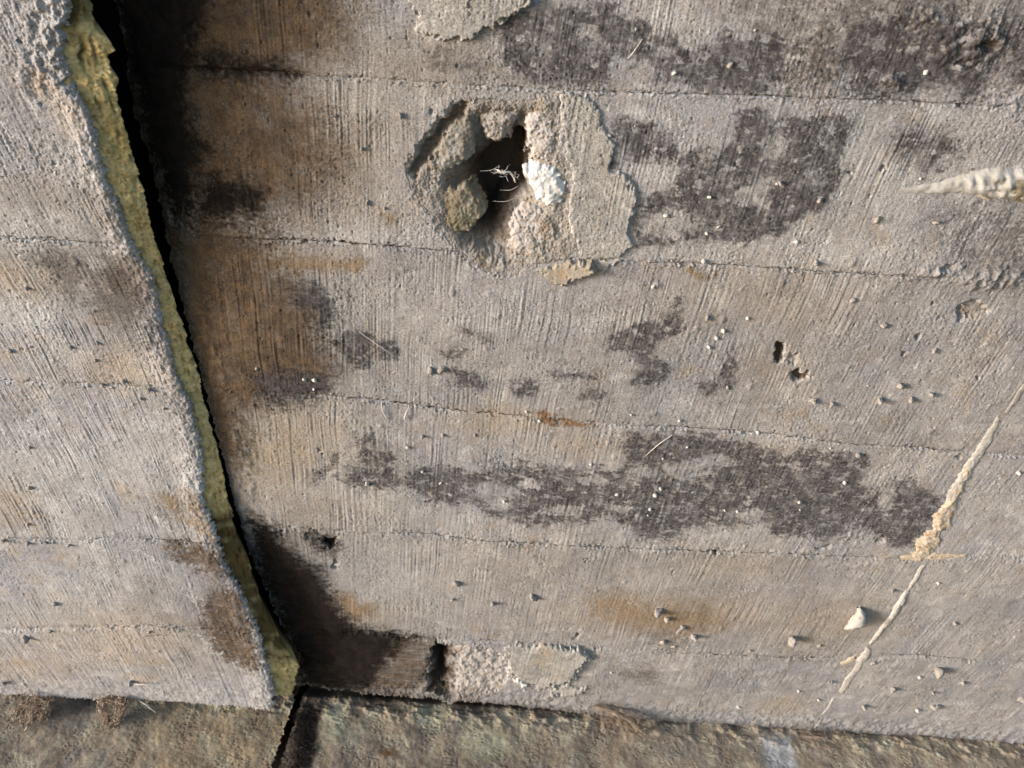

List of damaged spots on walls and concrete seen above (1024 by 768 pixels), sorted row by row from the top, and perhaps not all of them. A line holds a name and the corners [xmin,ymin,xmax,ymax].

flaking render [408,0,532,42]
leakage [502,0,1024,122]
leakage [118,0,399,468]
spalling [406,89,638,287]
leakage [610,107,854,246]
leakage [440,350,487,388]
leakage [510,379,538,397]
leakage [312,428,946,547]
leakage [244,512,419,690]
spalling [358,639,593,704]